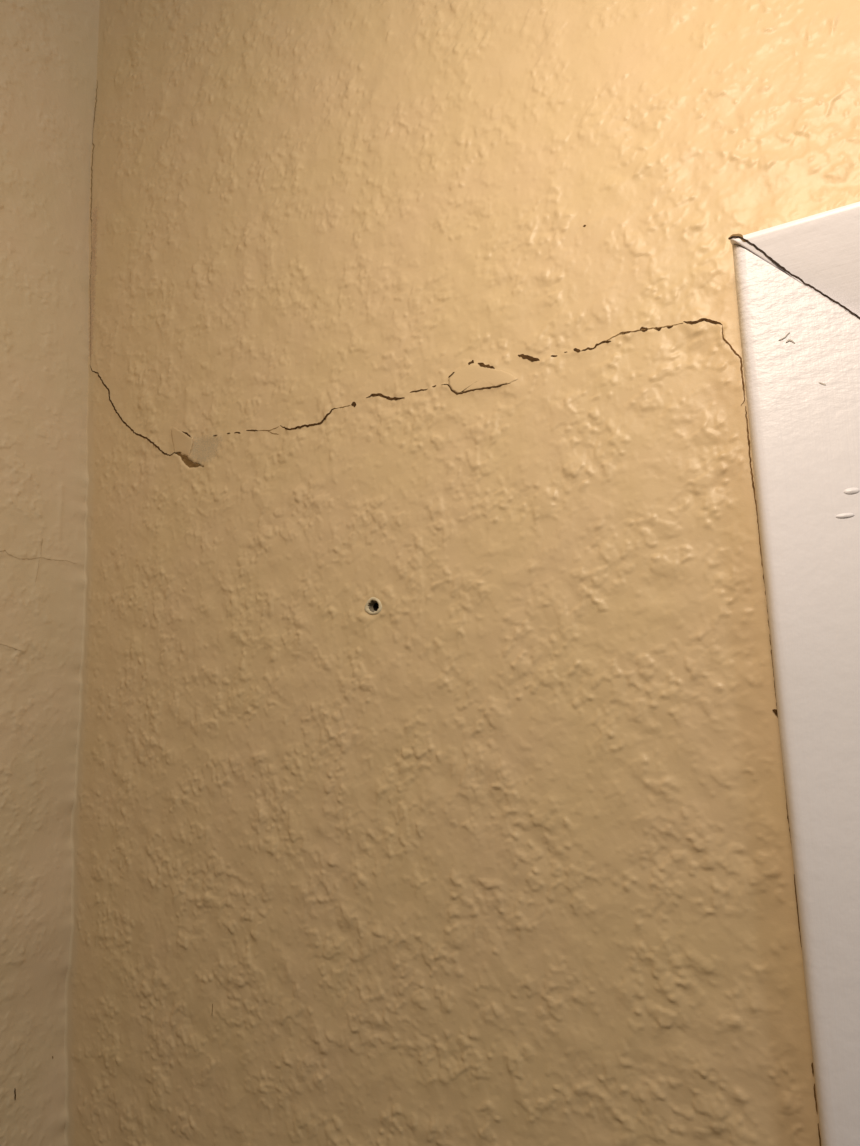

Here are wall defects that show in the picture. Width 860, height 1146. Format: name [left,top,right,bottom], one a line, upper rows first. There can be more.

crack [89,82,778,716]
peeling [171,427,204,468]
crack [794,874,802,947]
crack [811,1063,821,1146]